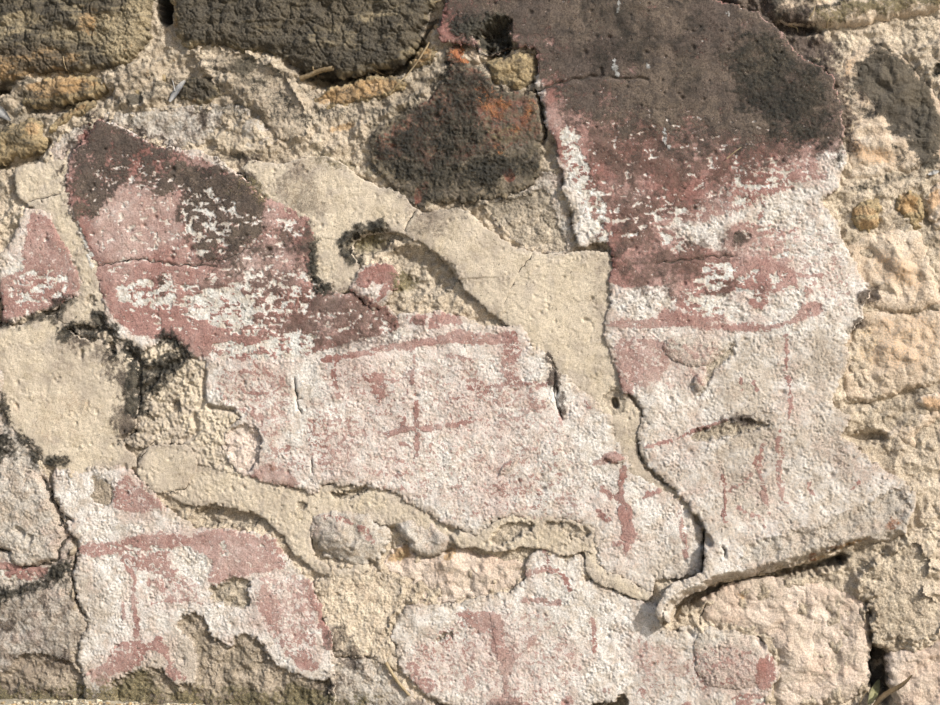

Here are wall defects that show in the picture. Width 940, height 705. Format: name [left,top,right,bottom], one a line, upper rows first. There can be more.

damp [437,0,869,164]
damp [368,60,540,235]
peeling [559,126,610,244]
crack [102,243,256,267]
spalling [348,229,458,301]
spalling [602,386,626,415]
spalling [225,423,262,472]
crack [0,479,79,568]
spalling [195,504,261,528]
spalling [332,485,368,499]
spalling [492,521,590,546]
spalling [195,571,253,609]